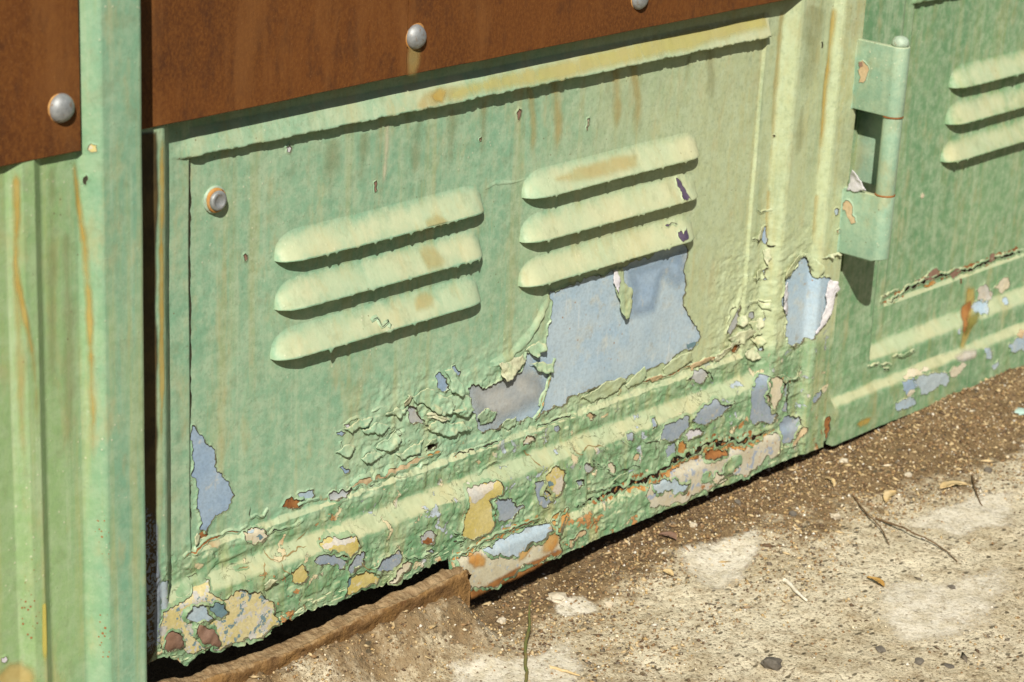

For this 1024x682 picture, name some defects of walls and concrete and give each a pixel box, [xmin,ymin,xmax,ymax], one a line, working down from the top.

rust [0,0,81,167]
rust [821,11,834,136]
rust [14,177,33,352]
rust [74,169,86,261]
rust [140,0,783,666]
peeling [279,220,711,511]
peeling [650,224,842,462]
rust [961,289,979,347]
peeling [190,421,235,546]
peeling [146,508,282,658]
peeling [289,529,414,599]
peeling [458,458,617,543]